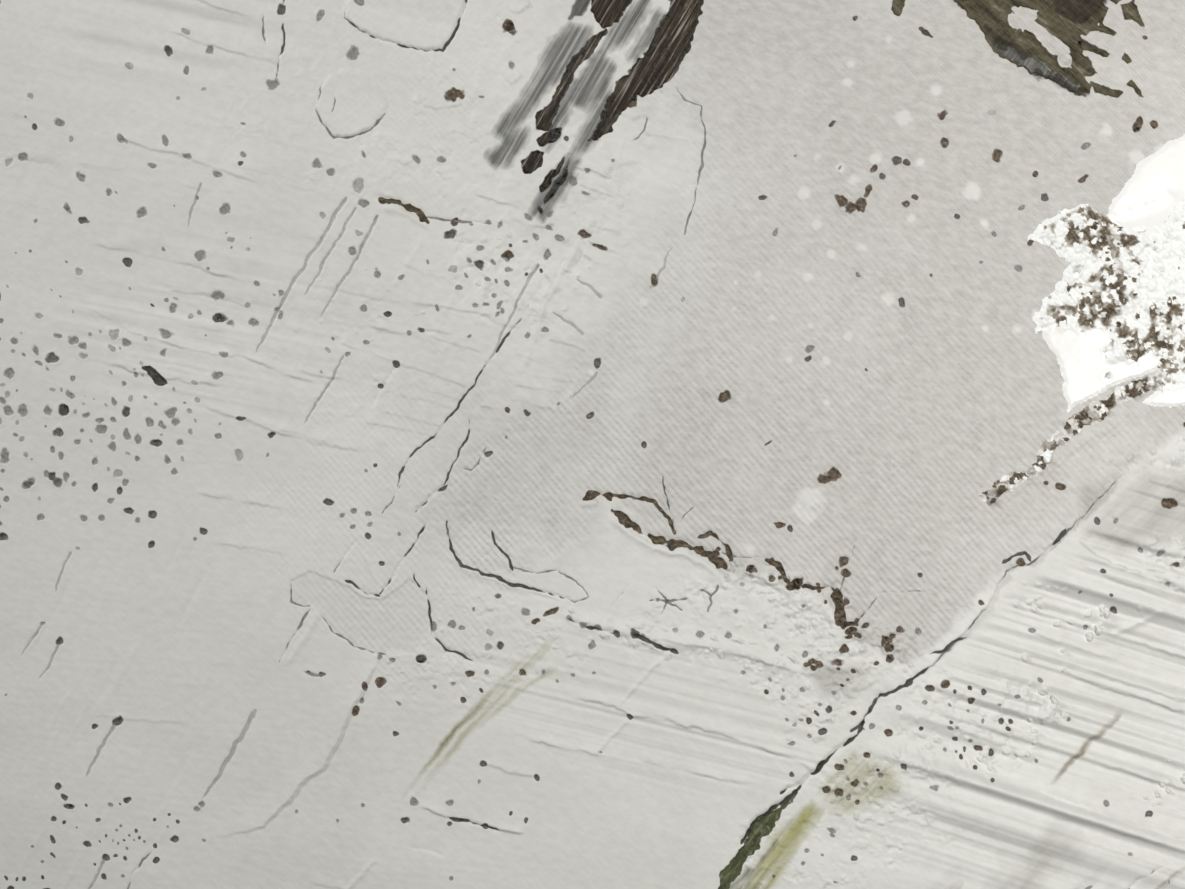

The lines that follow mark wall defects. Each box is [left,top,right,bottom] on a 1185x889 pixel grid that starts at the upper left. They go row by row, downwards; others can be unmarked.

peeling [588,0,704,141]
peeling [954,0,1147,98]
spalling [1133,117,1158,132]
spalling [835,165,886,213]
spalling [978,135,1185,505]
crack [334,332,678,661]
spalling [818,467,841,483]
crack [1002,481,1116,577]
spalling [522,607,645,649]
crack [583,480,978,889]
spalling [802,644,849,668]
crack [449,817,498,830]